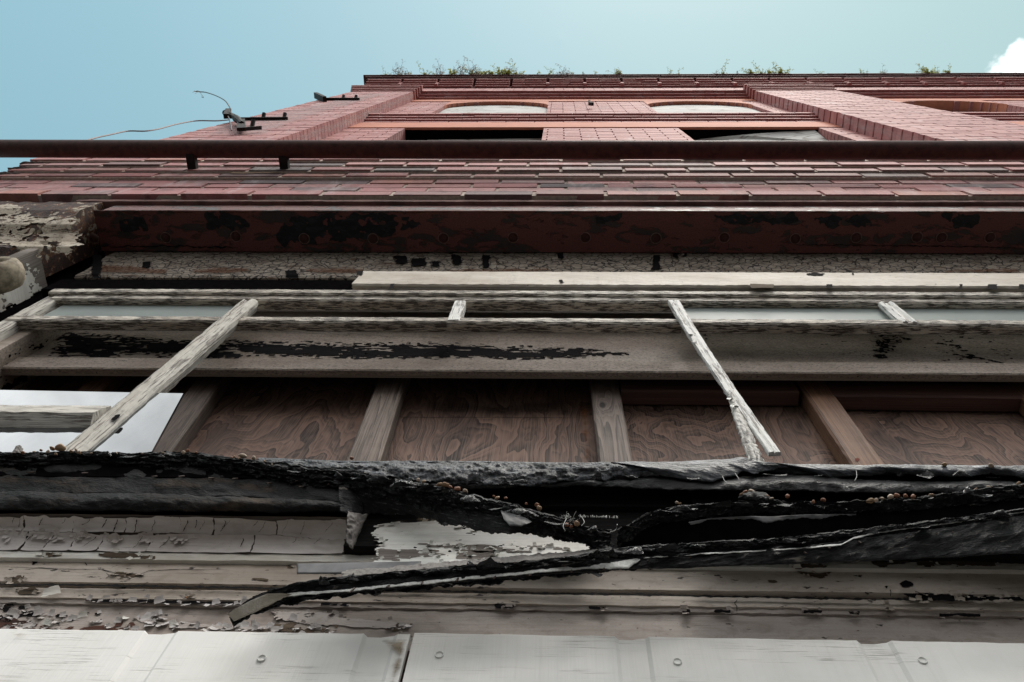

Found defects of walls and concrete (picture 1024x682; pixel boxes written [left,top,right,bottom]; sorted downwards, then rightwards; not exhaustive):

peeling [0,204,84,312]
peeling [9,332,192,358]
peeling [206,338,629,361]
peeling [0,375,29,390]
peeling [0,515,347,578]
peeling [371,518,589,564]
peeling [789,563,831,578]
peeling [0,575,248,631]
peeling [904,590,1024,614]
peeling [270,613,338,633]